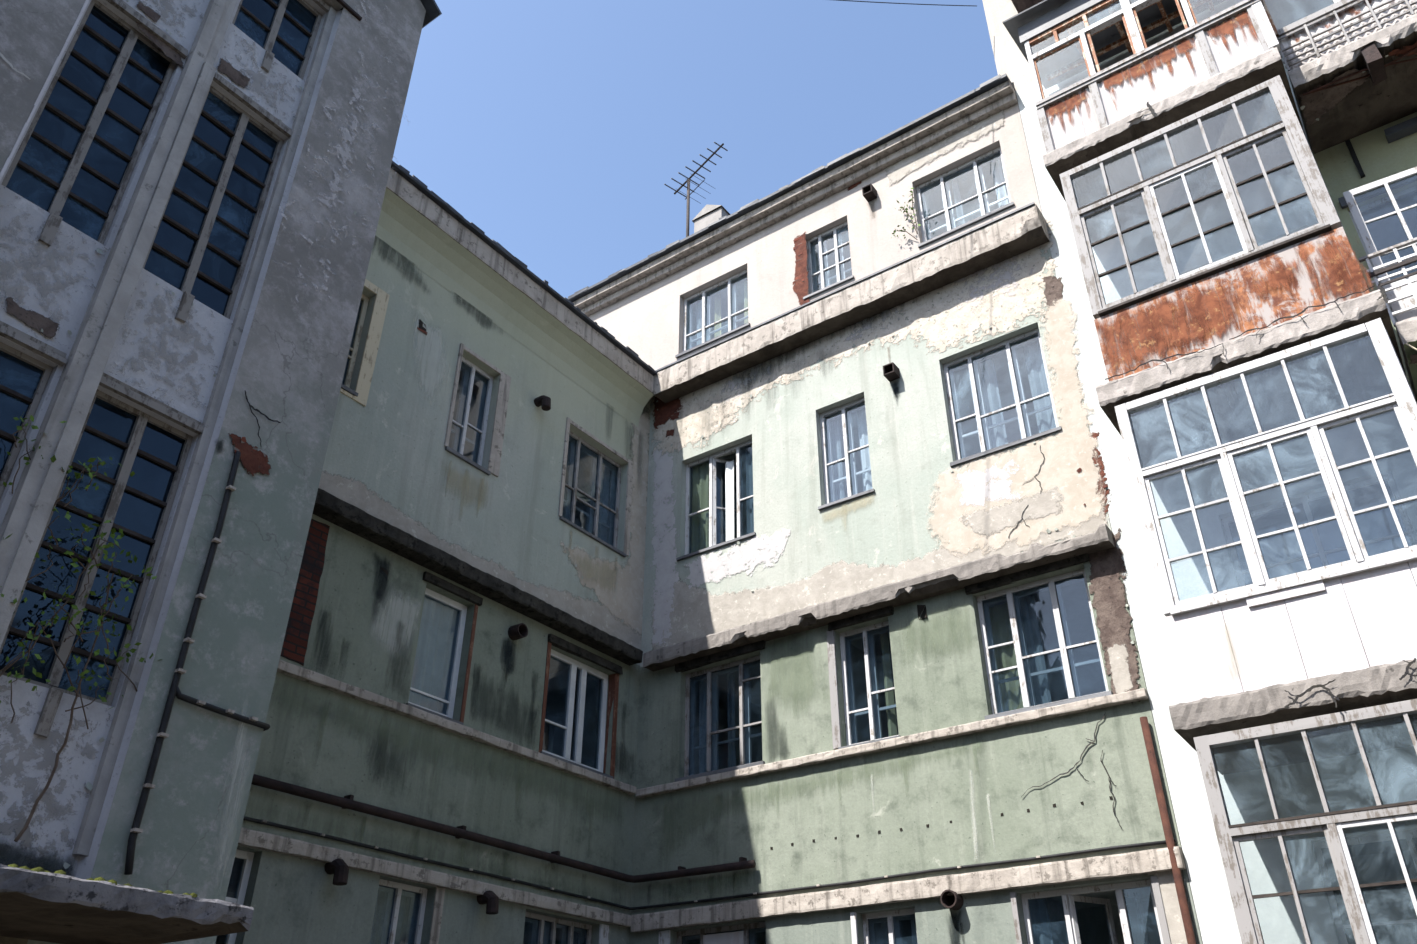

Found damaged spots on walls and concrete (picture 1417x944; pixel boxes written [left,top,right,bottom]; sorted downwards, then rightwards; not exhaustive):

corrosion [1104,10,1257,109]
corrosion [1045,89,1090,130]
corrosion [1251,237,1373,300]
corrosion [1096,281,1237,373]
flaking render [228,433,271,476]
flaking render [318,216,1141,704]
crack [1284,680,1340,708]
crack [1399,658,1417,680]
crack [1021,714,1122,828]